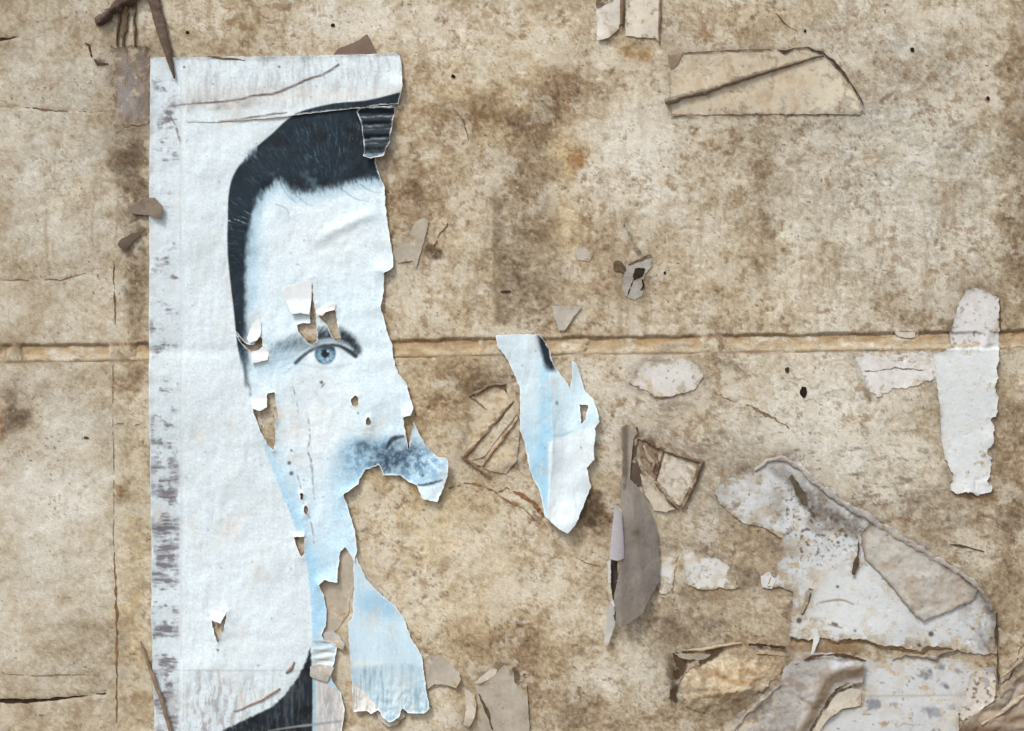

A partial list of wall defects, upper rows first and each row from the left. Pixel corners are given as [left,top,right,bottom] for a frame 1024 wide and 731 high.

peeling [630,358,703,399]
peeling [854,286,1001,496]
crack [0,365,143,722]
peeling [657,455,1000,731]